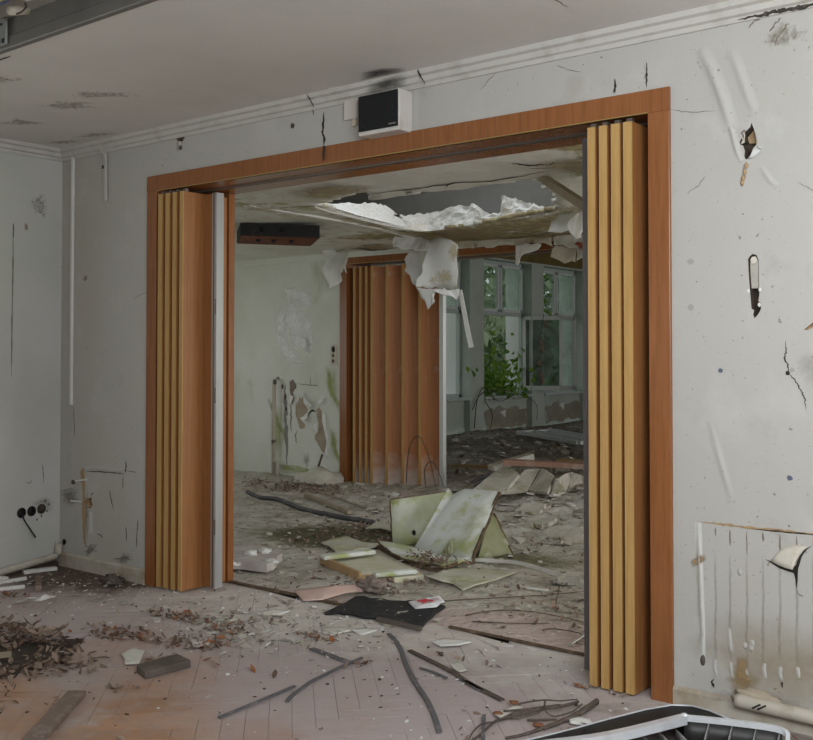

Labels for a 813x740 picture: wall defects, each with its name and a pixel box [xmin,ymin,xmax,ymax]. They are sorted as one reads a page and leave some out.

crack [739,3,813,46]
crack [307,95,326,160]
spalling [740,123,763,186]
spalling [315,195,558,231]
spalling [747,254,761,318]
crack [784,341,806,406]
spalling [288,380,328,459]
spalling [484,405,527,430]